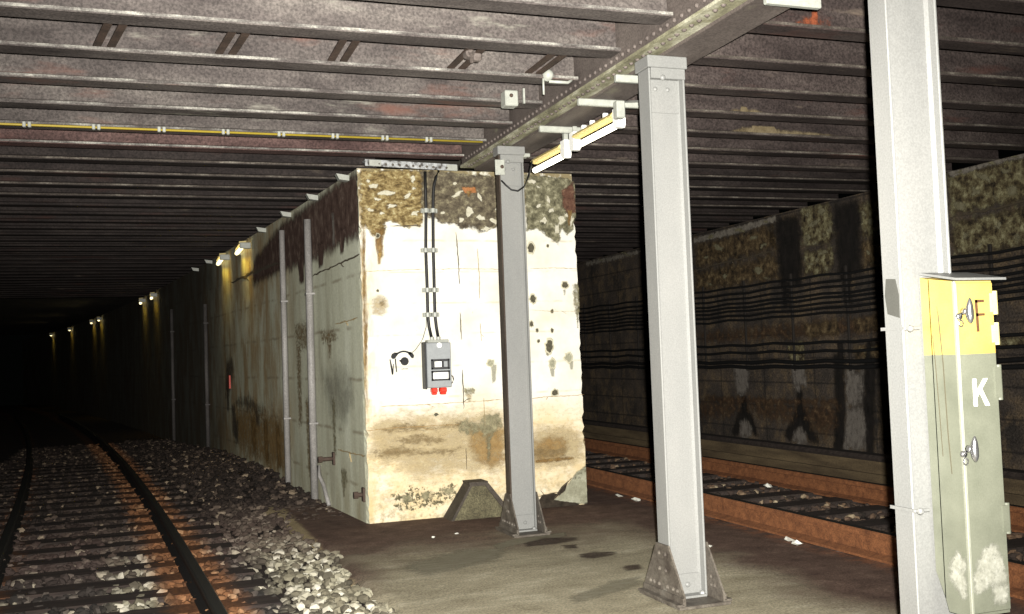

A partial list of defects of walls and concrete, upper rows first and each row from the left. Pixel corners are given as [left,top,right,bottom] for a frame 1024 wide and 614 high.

peeling [359,169,498,239]
peeling [524,175,576,255]
corrosion [253,173,384,370]
crack [313,235,499,341]
leakage [226,358,259,440]
leakage [372,414,502,473]
leakage [733,396,757,435]
leakage [786,391,818,442]
leakage [833,343,846,449]
leakage [864,342,875,453]